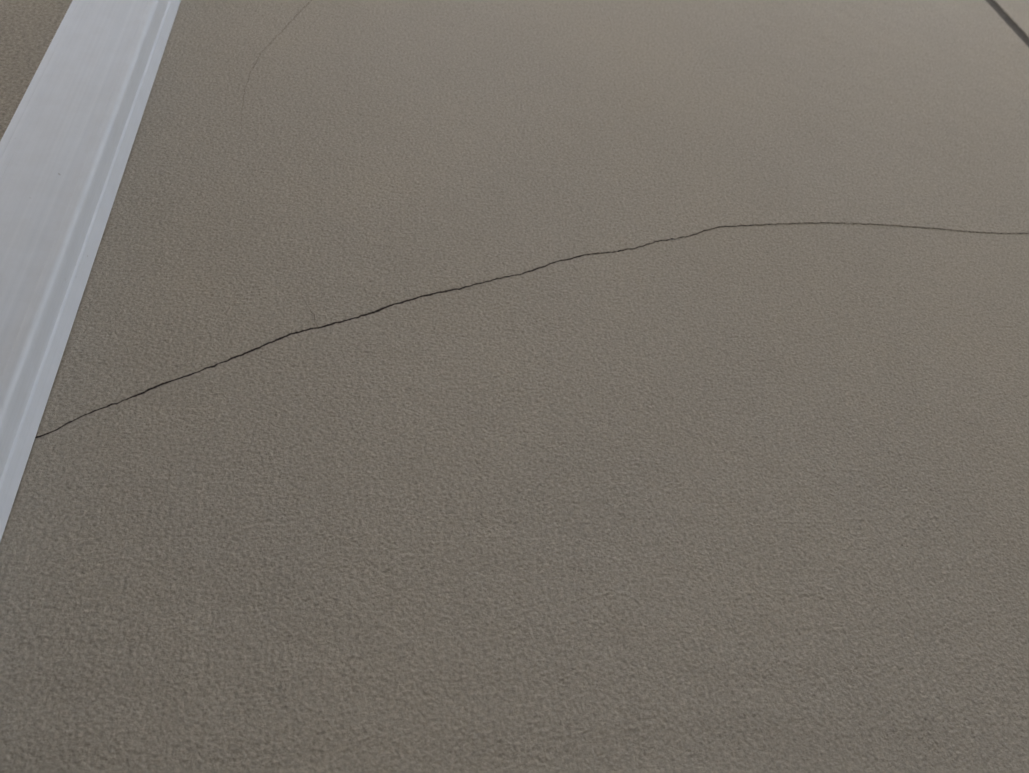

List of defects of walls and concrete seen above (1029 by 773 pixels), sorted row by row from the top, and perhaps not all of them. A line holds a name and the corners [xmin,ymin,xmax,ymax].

crack [35,222,1029,438]